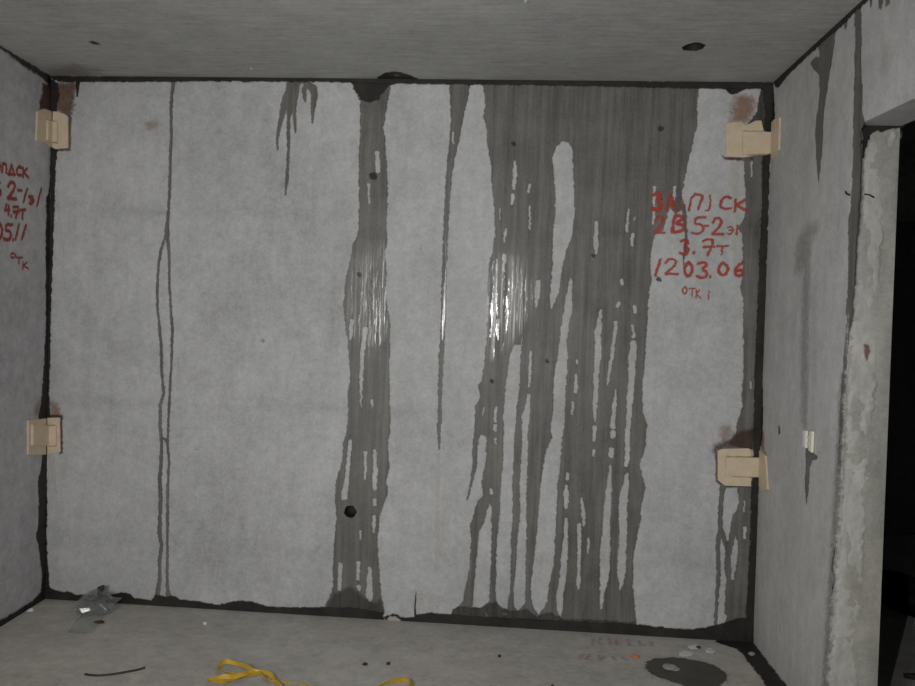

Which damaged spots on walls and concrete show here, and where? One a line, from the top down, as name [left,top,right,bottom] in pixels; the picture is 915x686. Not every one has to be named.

rust [40,74,75,151]
leakage [155,81,175,597]
leakage [276,81,318,195]
leakage [325,72,418,614]
leakage [437,84,470,449]
leakage [452,84,698,625]
leakage [645,657,727,686]
leakage [714,483,752,625]
rust [714,430,765,487]
rust [733,97,753,120]
leakage [732,155,763,439]
leakage [811,0,890,472]